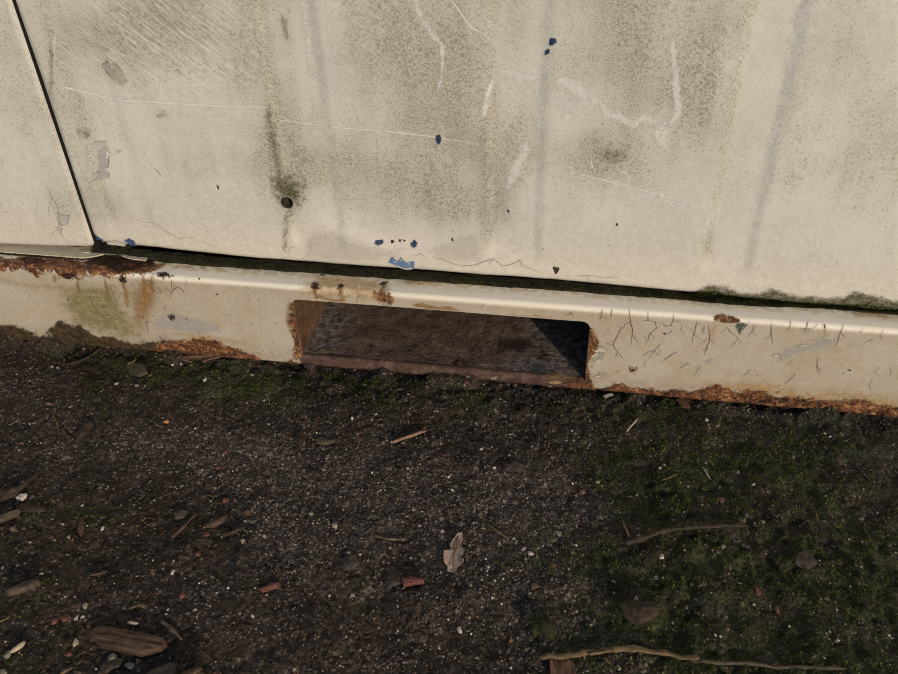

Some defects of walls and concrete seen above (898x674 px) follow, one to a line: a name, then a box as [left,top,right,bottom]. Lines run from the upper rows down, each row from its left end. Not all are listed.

peeling [89,141,122,183]
rust [0,256,173,324]
rust [154,336,262,361]
rust [287,303,302,364]
rust [310,274,395,306]
rust [549,331,898,417]
rust [714,313,740,323]
crack [599,309,884,381]